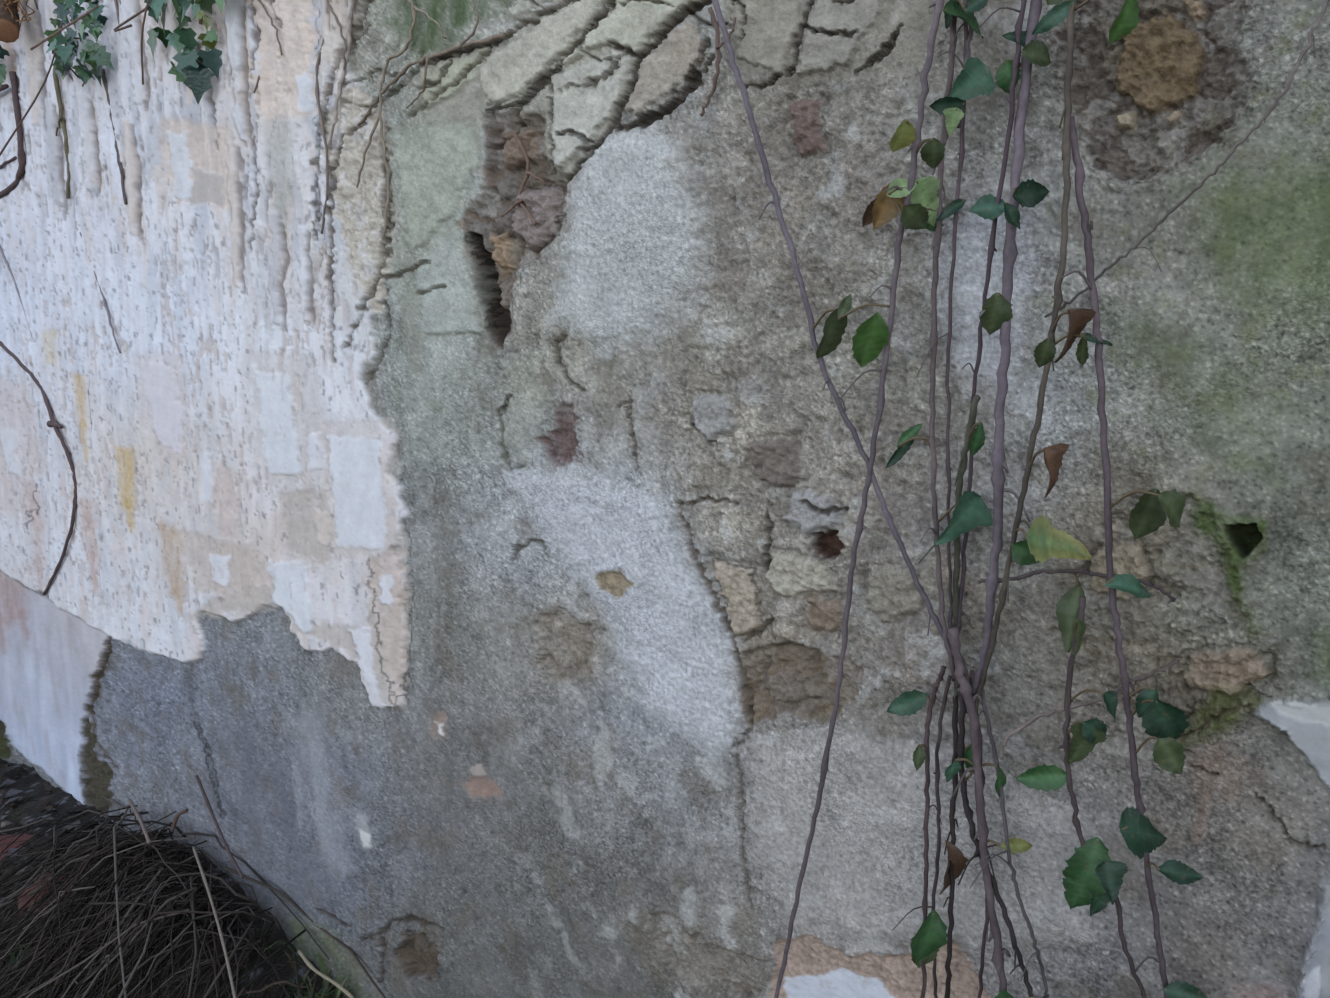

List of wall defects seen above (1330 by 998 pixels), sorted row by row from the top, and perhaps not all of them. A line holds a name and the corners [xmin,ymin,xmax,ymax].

crack [746,0,900,90]
crack [311,0,747,387]
spalling [0,0,1330,793]
spalling [387,929,445,986]
spalling [631,905,994,998]
peeling [1292,859,1330,998]